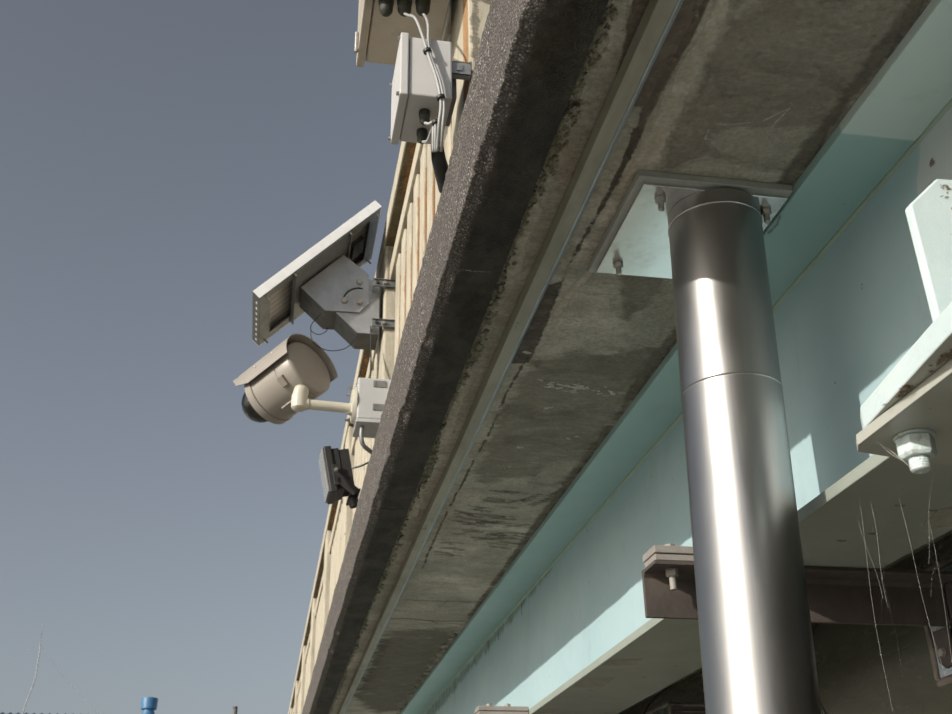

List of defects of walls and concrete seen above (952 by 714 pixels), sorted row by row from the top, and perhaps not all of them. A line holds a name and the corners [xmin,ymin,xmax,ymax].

water stain [572,0,926,261]
water stain [353,624,461,713]